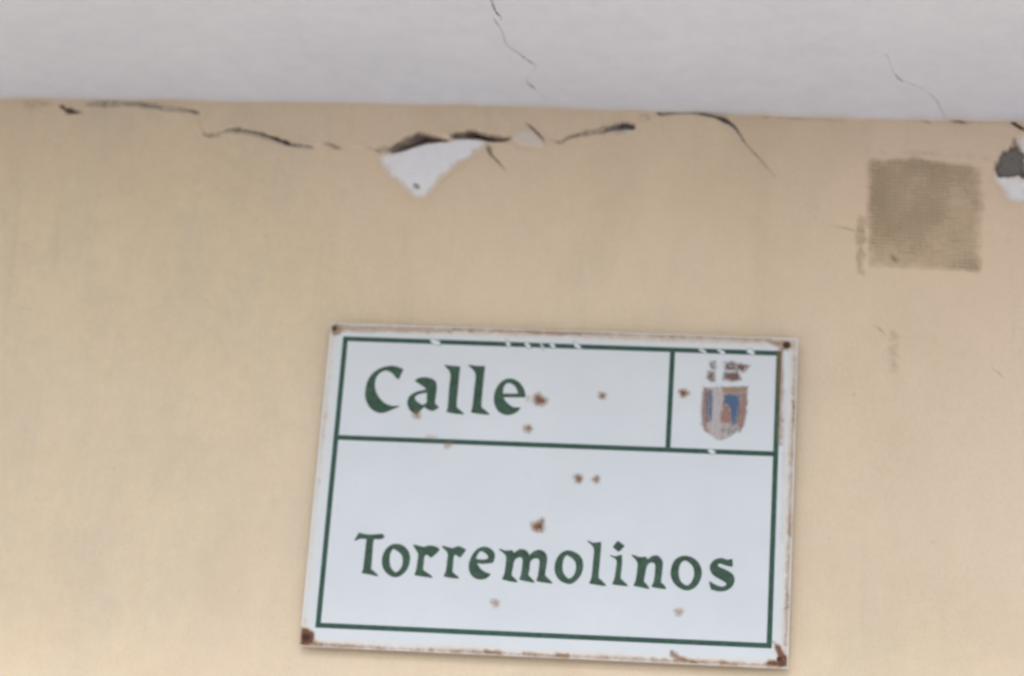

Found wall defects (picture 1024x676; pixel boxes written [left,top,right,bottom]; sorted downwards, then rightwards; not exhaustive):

crack [60,101,336,151]
flaking render [376,124,548,202]
crack [584,113,757,156]
flaking render [992,130,1024,206]